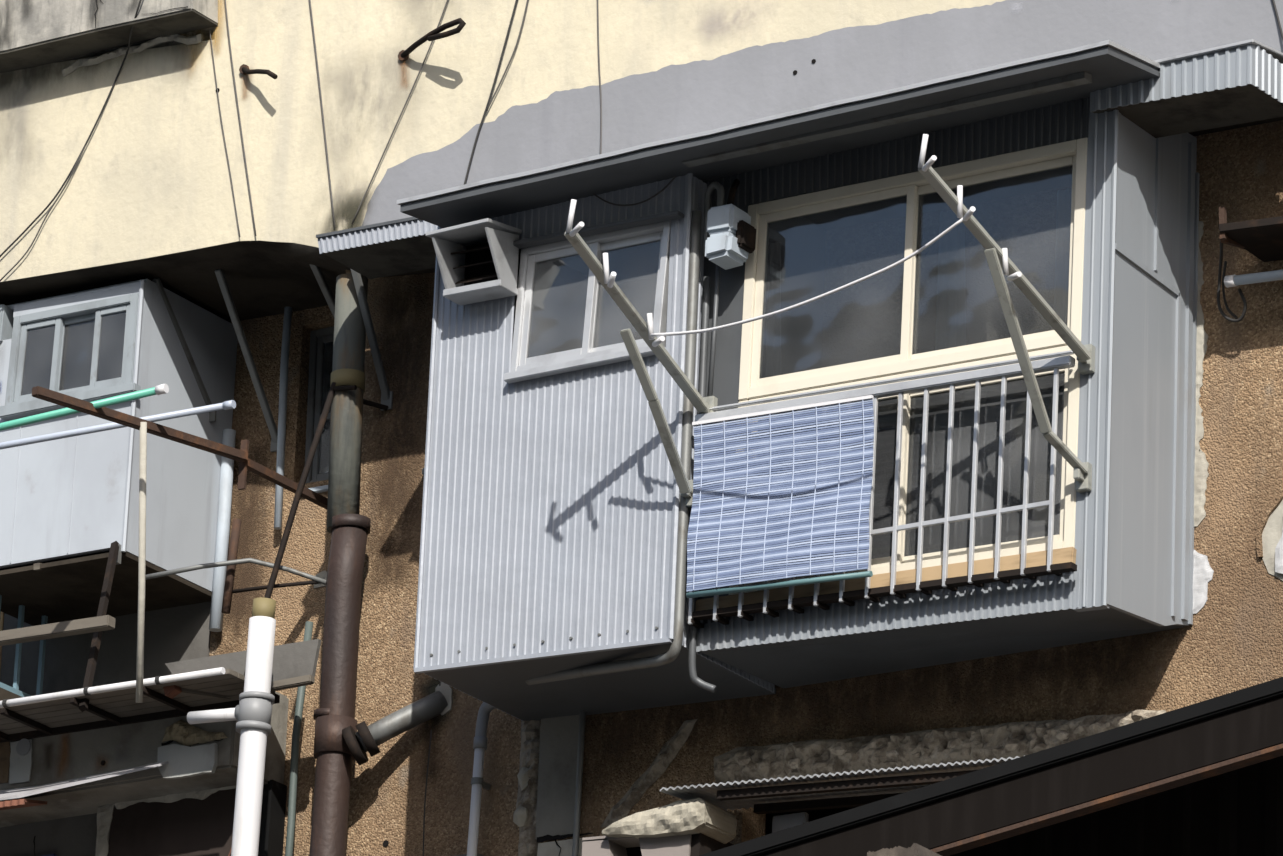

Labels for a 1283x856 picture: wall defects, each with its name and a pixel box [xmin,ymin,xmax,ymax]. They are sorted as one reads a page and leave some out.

leakage [327,199,365,233]
peeling [1194,221,1209,527]
spalling [1256,486,1283,581]
peeling [1193,550,1214,614]
peeling [0,742,11,784]